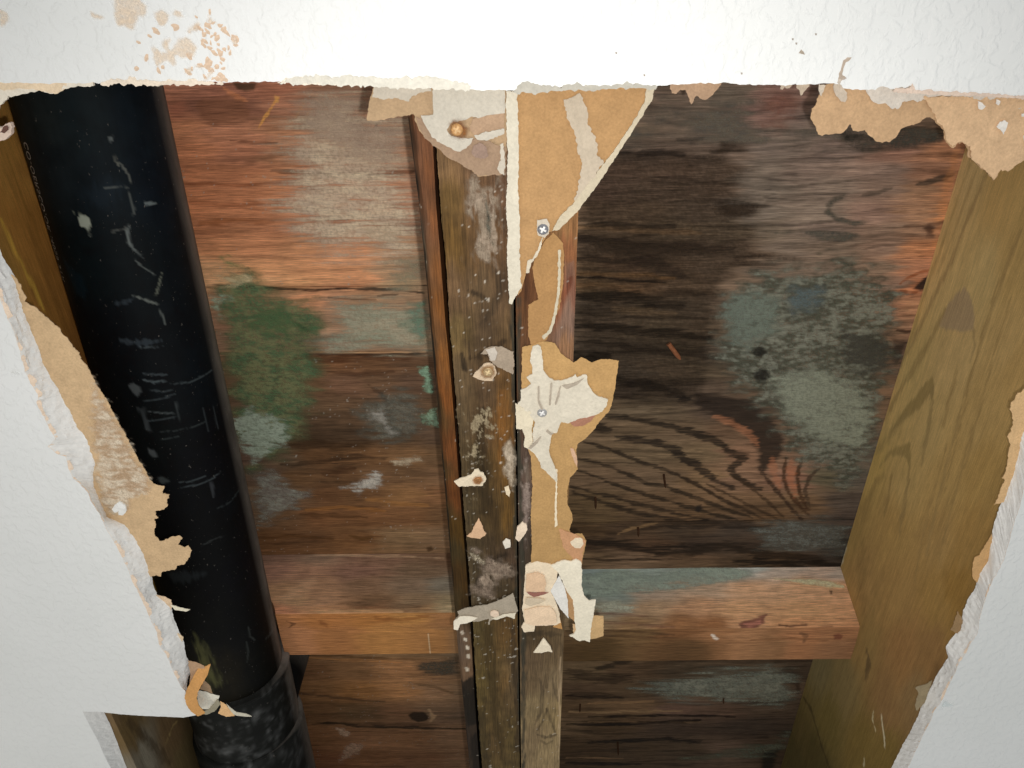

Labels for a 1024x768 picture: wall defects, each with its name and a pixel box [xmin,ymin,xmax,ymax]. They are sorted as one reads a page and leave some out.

peeling [115,0,239,82]
damp [271,91,422,290]
damp [213,268,428,520]
damp [710,255,908,488]
mould [582,567,750,612]